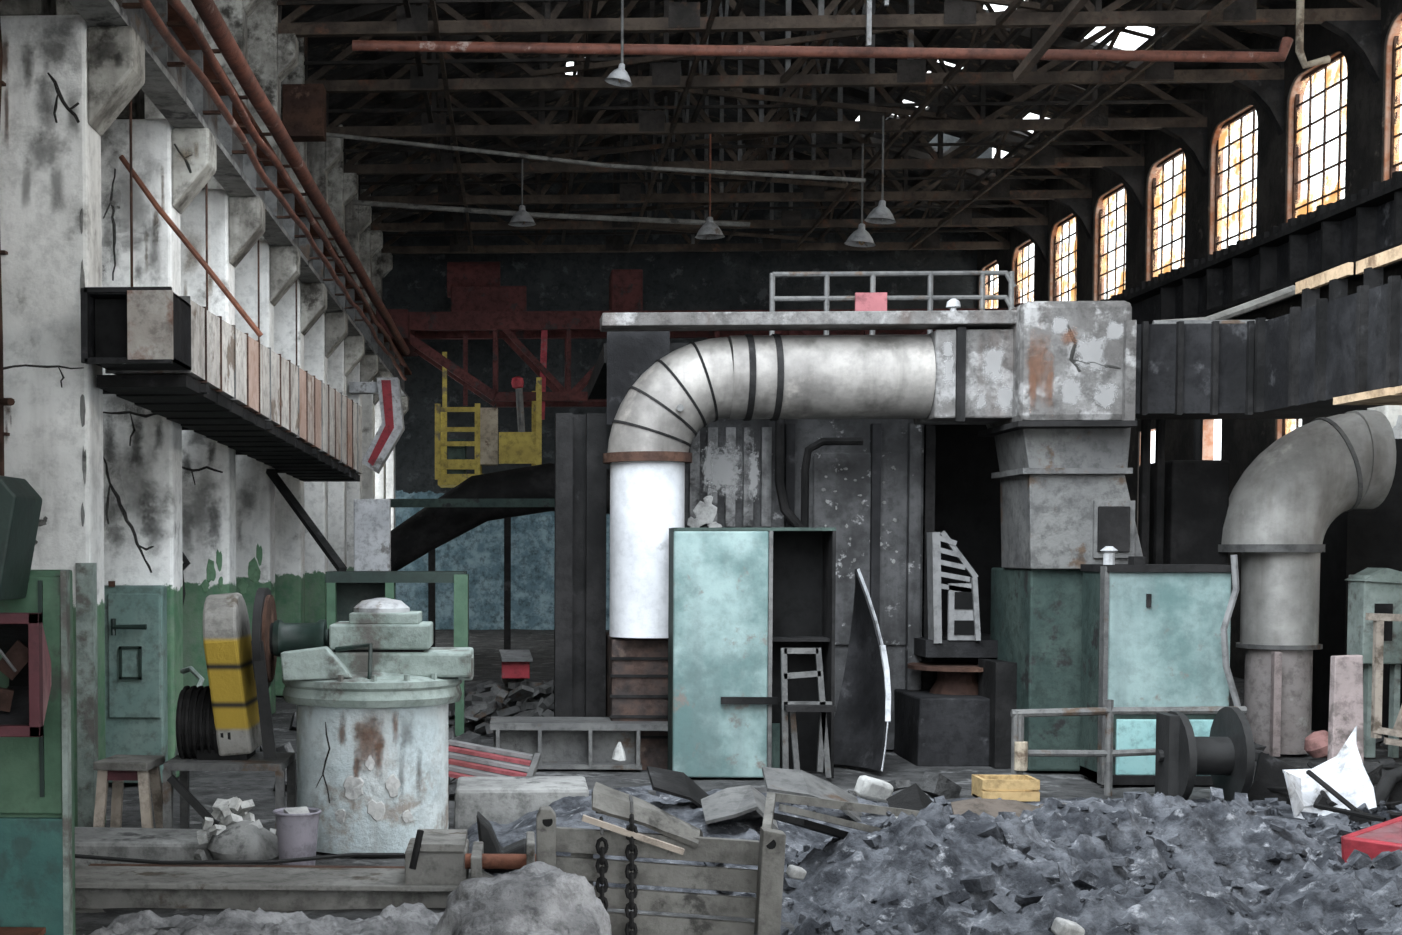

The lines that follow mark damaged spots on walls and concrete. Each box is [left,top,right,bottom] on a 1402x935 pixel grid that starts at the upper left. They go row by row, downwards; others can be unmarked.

damp [25,51,51,114]
crack [47,72,80,123]
rust [1028,346,1053,399]
crack [103,411,157,573]
flaking render [687,495,722,528]